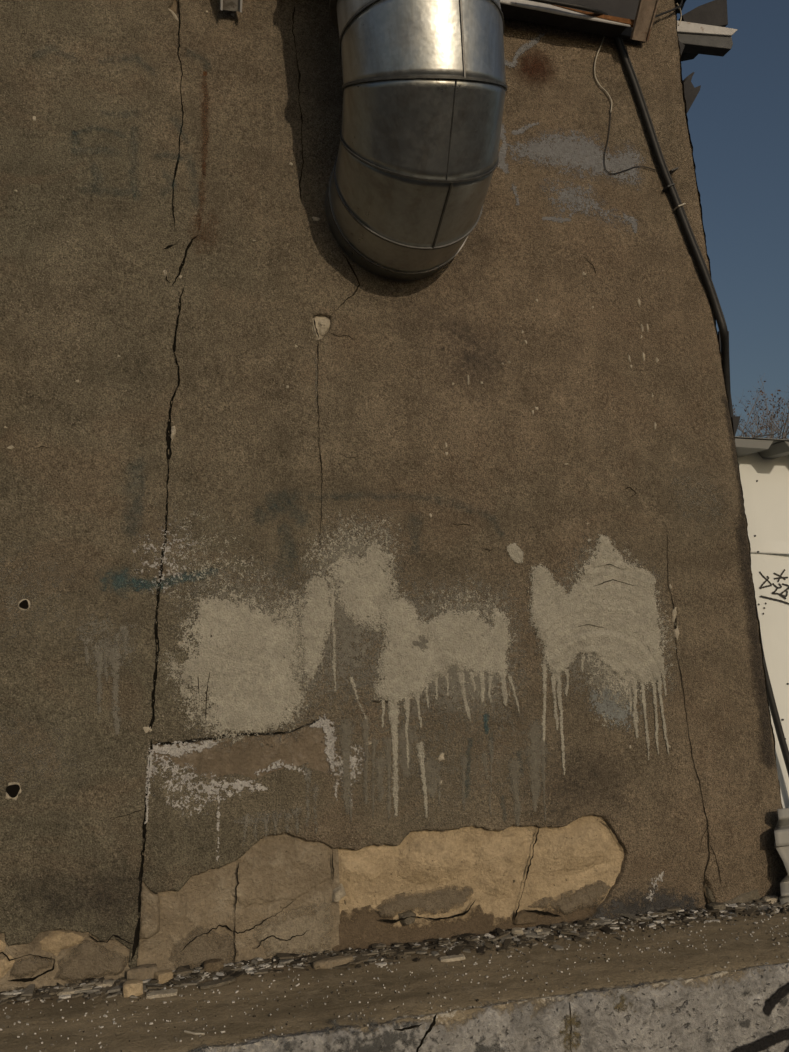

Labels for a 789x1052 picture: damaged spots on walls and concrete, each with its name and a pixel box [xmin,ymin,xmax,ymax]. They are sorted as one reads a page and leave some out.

crack [292,6,304,198]
flaking render [312,316,355,340]
crack [329,256,360,317]
crack [112,0,198,960]
crack [315,344,323,578]
crack [667,535,722,909]
flaking render [0,815,624,996]
crack [394,1014,437,1052]